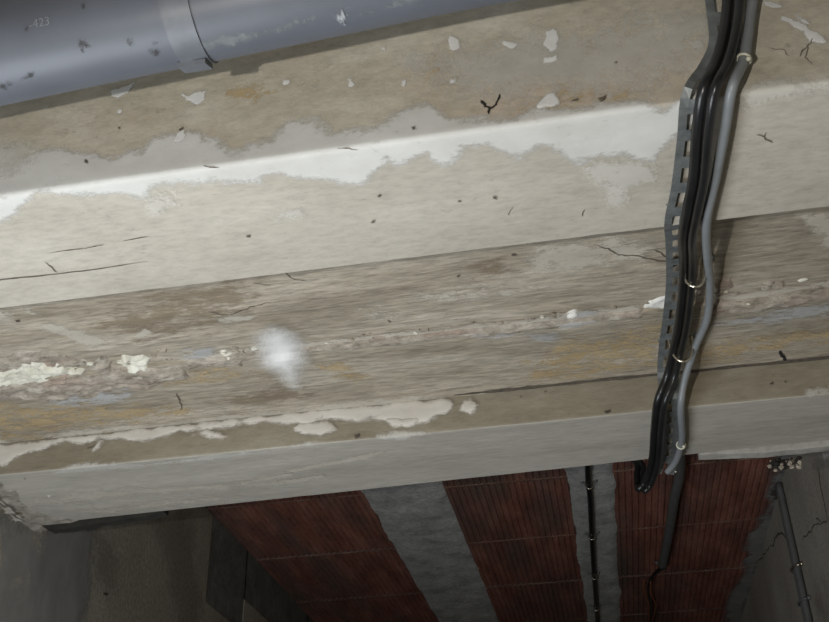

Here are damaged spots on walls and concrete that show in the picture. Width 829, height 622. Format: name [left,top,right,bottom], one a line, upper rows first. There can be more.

damp [718,282,829,301]
damp [121,354,150,374]
crack [679,351,829,374]
damp [0,362,85,387]
crack [454,374,657,396]
peeling [460,398,478,414]
peeling [201,428,225,438]
peeling [294,421,337,435]
peeling [387,418,419,428]
crack [759,466,827,561]